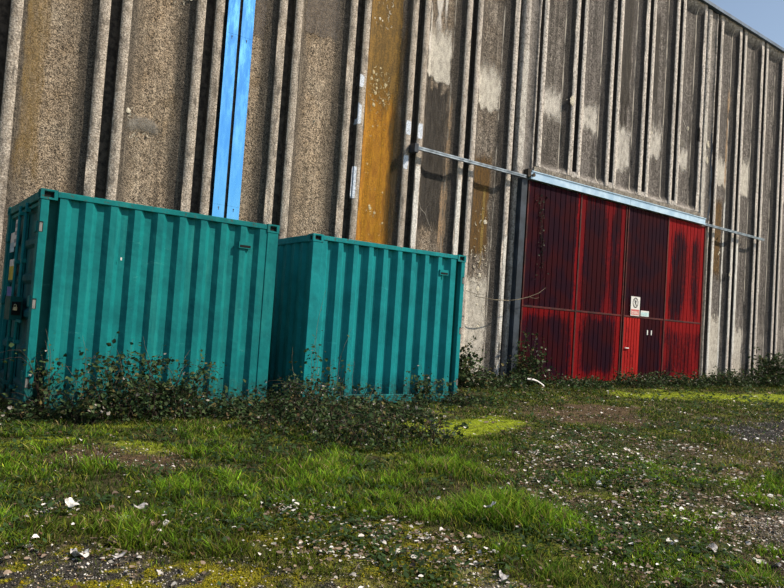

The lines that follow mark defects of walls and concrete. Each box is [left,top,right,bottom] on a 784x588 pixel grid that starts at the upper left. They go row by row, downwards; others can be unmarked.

rust [356,0,405,245]
leakage [411,0,452,249]
leakage [453,178,461,255]
rust [470,155,491,266]
leakage [478,67,501,112]
leakage [517,48,530,169]
leakage [543,88,561,118]
leakage [616,0,634,172]
leakage [650,126,662,159]
leakage [697,111,708,216]
leakage [717,160,726,188]
leakage [741,162,749,198]